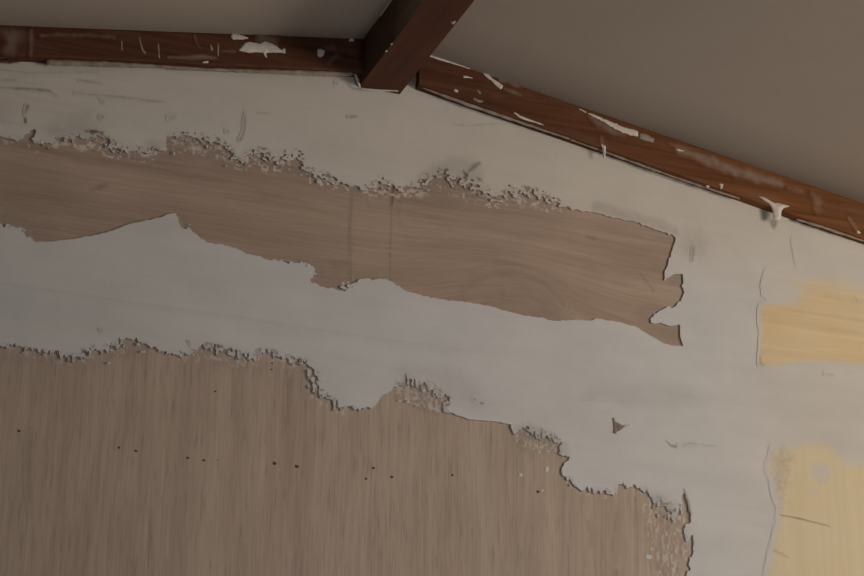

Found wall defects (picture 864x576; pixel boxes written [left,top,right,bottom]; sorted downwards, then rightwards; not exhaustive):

peeling [0,126,684,346]
peeling [757,262,864,370]
peeling [0,338,693,576]
peeling [762,436,864,576]